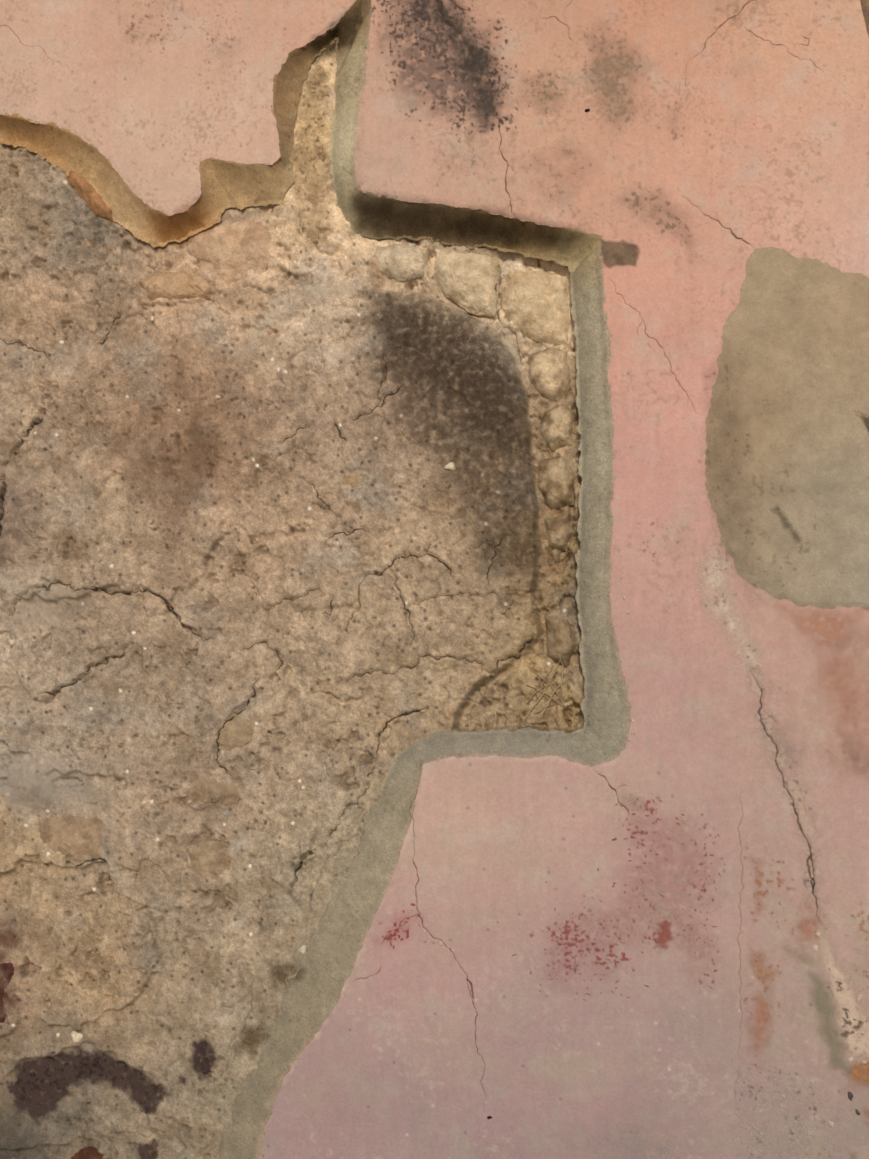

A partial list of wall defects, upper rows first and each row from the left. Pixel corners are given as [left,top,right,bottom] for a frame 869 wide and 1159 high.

damp [317,0,517,133]
damp [381,305,530,564]
flaking render [696,246,869,696]
crack [43,646,128,702]
crack [12,581,213,641]
crack [216,641,283,780]
spalling [0,0,638,1159]
crack [269,538,532,679]
peeling [544,814,721,998]
peeling [612,795,684,868]
crack [749,666,823,928]
spalling [756,712,820,908]